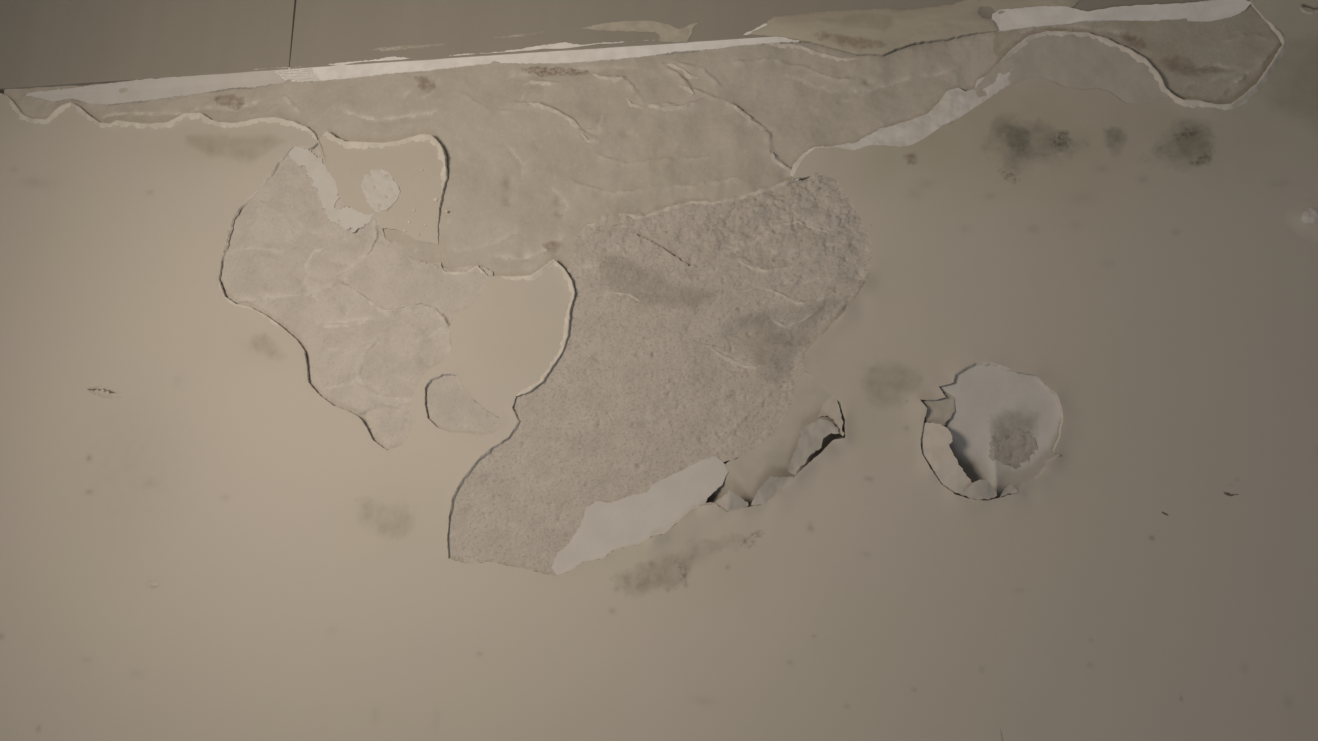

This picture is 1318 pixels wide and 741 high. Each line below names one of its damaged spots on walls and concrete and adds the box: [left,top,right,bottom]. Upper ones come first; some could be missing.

peeling [4,0,1288,576]